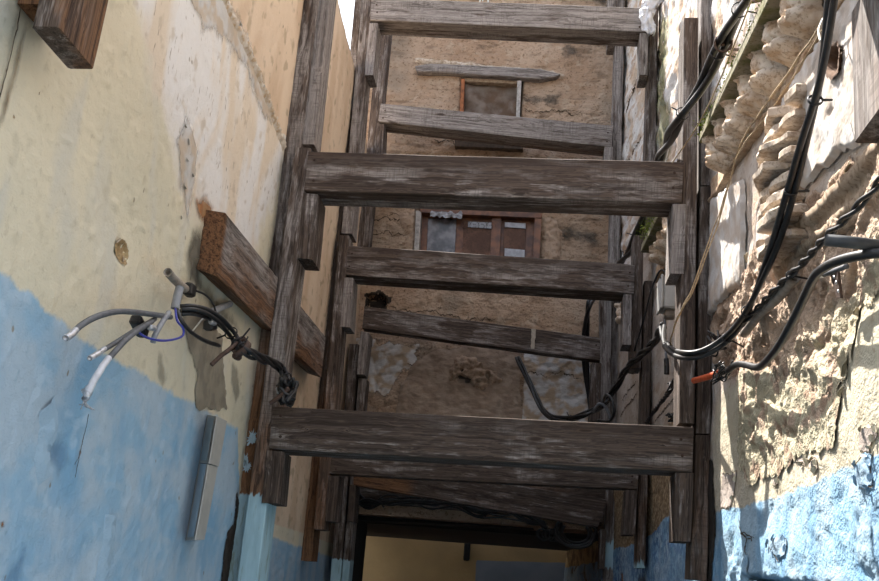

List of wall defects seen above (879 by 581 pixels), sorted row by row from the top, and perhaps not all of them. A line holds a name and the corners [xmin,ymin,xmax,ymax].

crack [0,8,21,97]
peeling [192,0,274,120]
spalling [805,156,855,211]
spalling [845,150,879,239]
spalling [710,211,879,397]
peeling [795,453,818,475]
peeling [851,422,877,490]